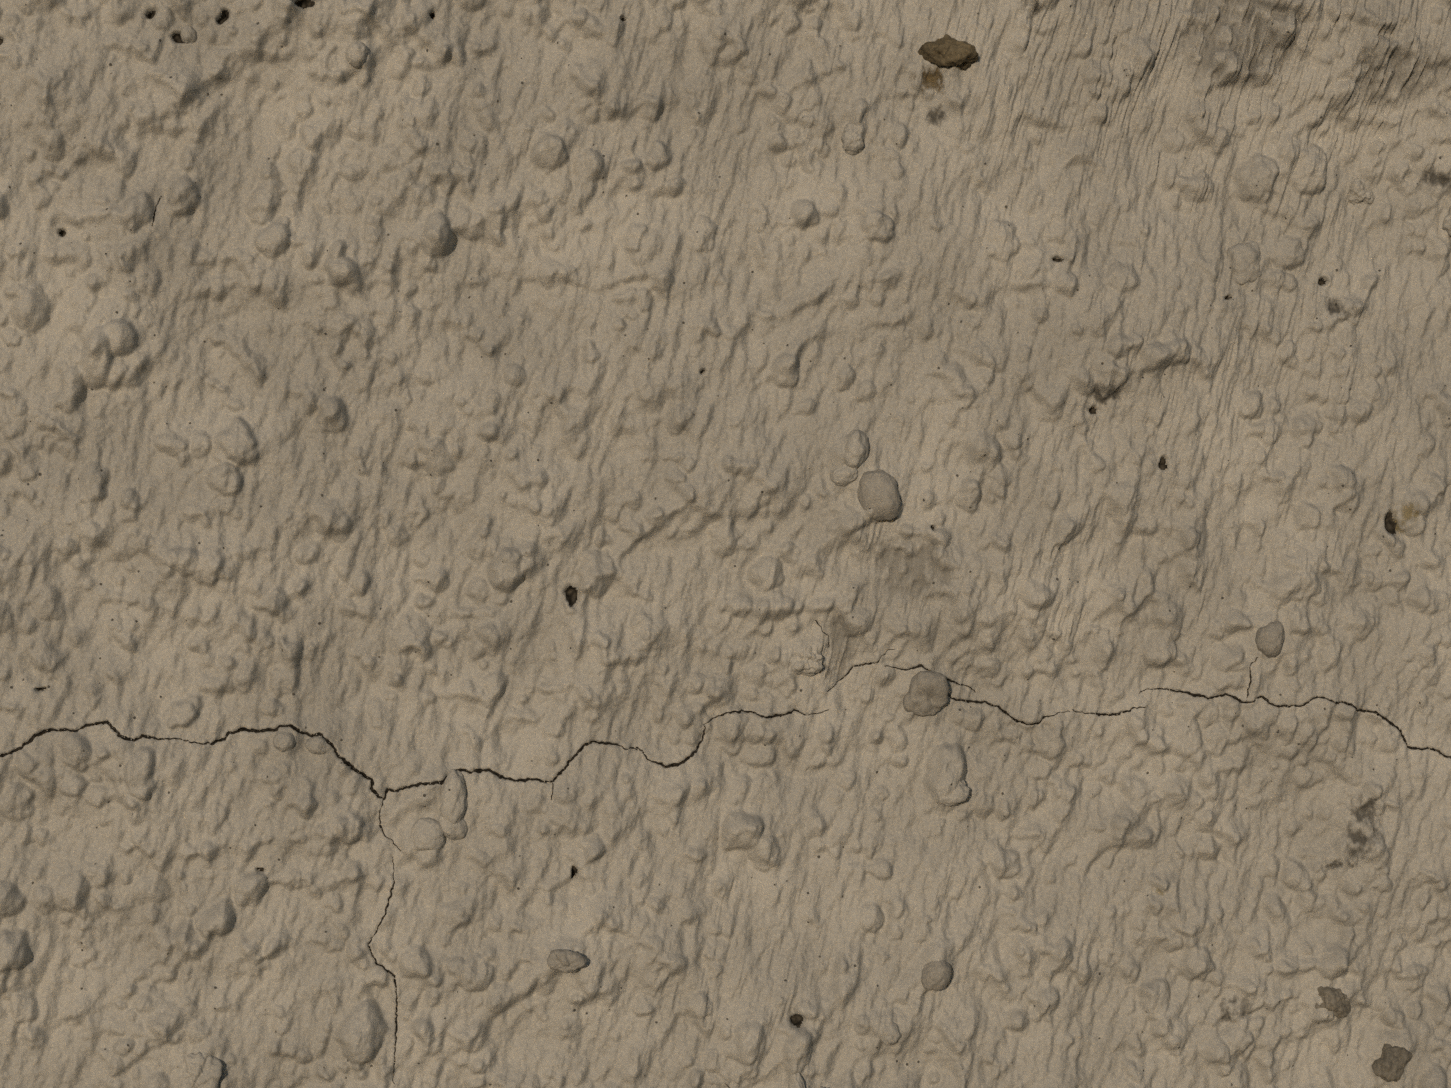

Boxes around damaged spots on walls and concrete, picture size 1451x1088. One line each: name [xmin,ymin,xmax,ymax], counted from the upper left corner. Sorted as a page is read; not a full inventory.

crack [0,620,1451,1084]